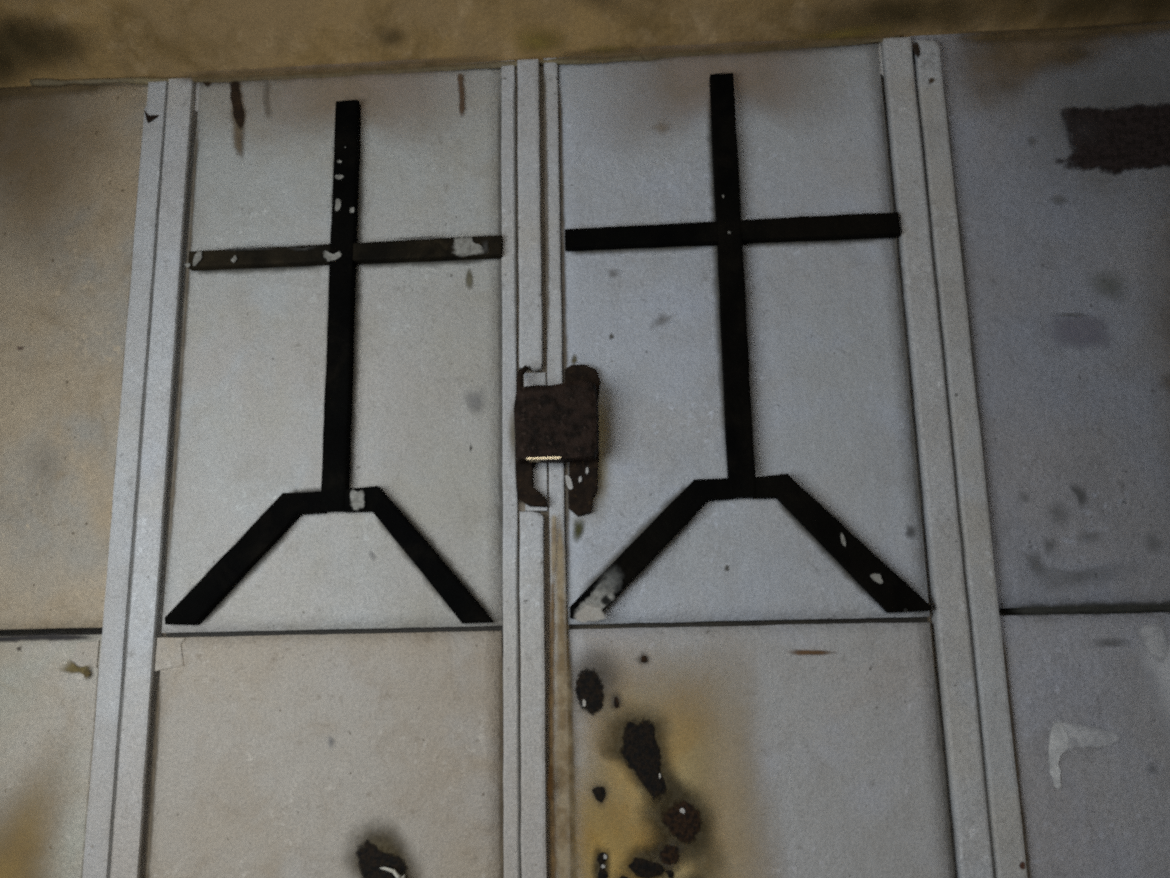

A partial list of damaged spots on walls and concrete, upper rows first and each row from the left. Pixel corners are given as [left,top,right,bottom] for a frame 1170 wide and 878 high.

corrosion [230,81,244,155]
peeling [1057,104,1170,174]
corrosion [598,402,608,489]
corrosion [548,516,762,878]